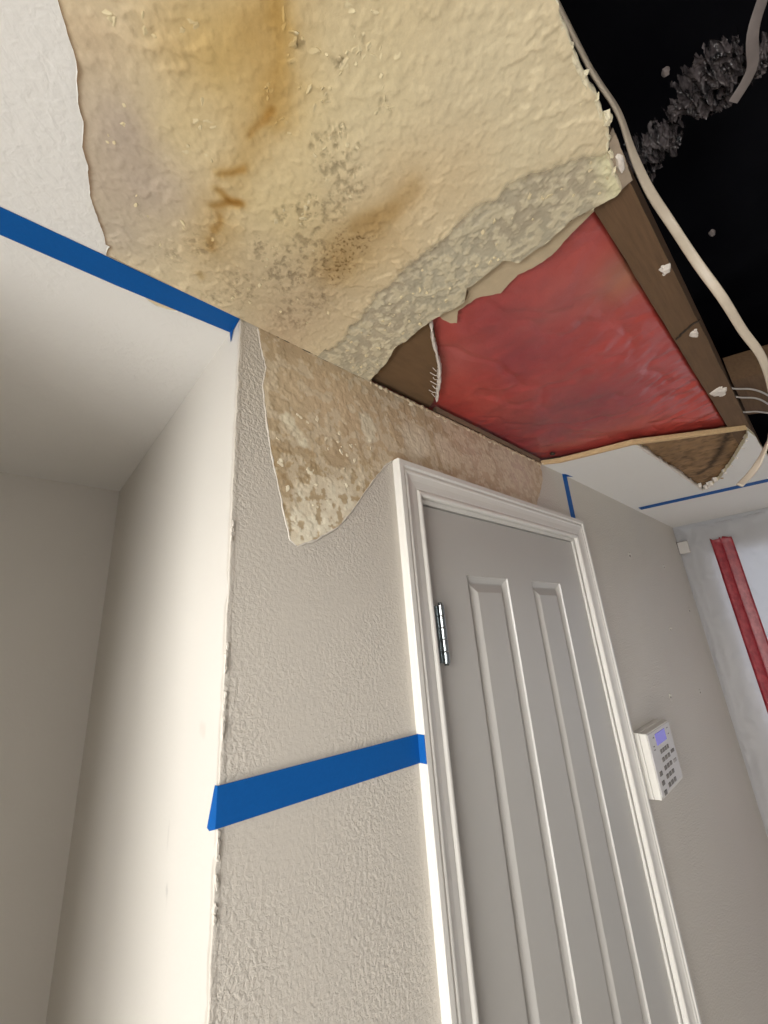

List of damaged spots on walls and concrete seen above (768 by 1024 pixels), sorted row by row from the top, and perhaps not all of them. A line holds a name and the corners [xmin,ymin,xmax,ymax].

peeling [257,327,543,547]